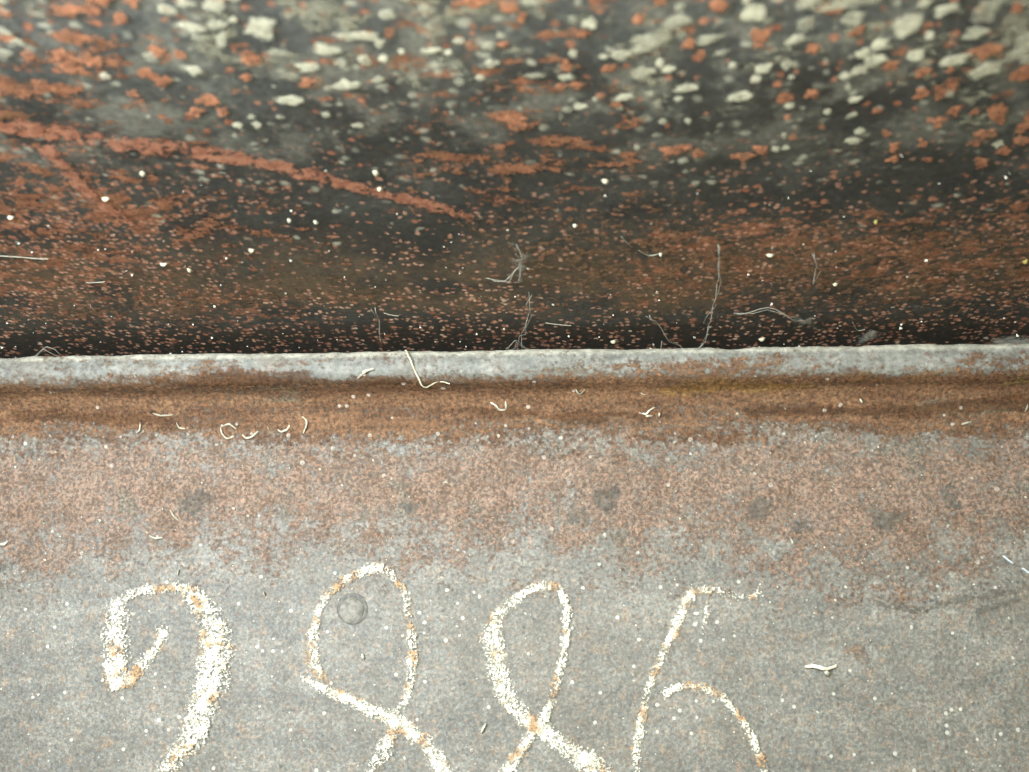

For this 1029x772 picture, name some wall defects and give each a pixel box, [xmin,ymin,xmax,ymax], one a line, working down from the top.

corrosion [632,0,666,25]
corrosion [709,0,729,13]
corrosion [682,37,705,58]
corrosion [750,28,771,50]
corrosion [965,43,1004,62]
corrosion [1009,63,1029,81]
corrosion [776,89,818,120]
corrosion [912,66,1029,169]
corrosion [659,144,706,159]
corrosion [730,146,768,161]
corrosion [882,130,901,163]
corrosion [0,351,1029,620]